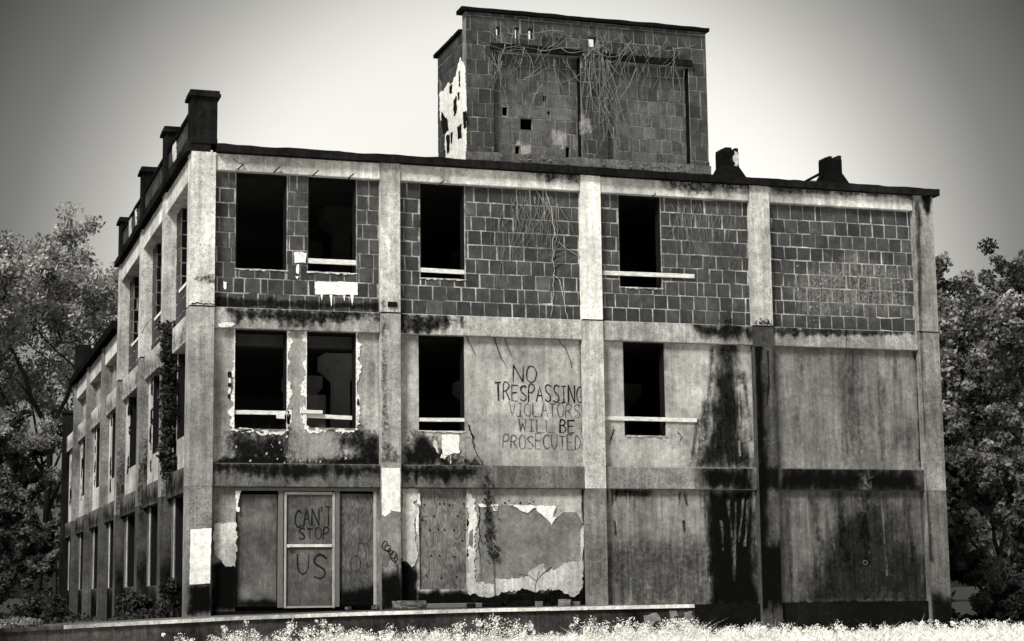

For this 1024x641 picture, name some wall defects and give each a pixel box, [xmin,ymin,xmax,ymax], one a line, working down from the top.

peeling [439,57,467,159]
water stain [216,297,386,331]
spalling [218,322,362,463]
water stain [213,401,480,485]
water stain [607,324,952,630]
peeling [466,490,584,597]